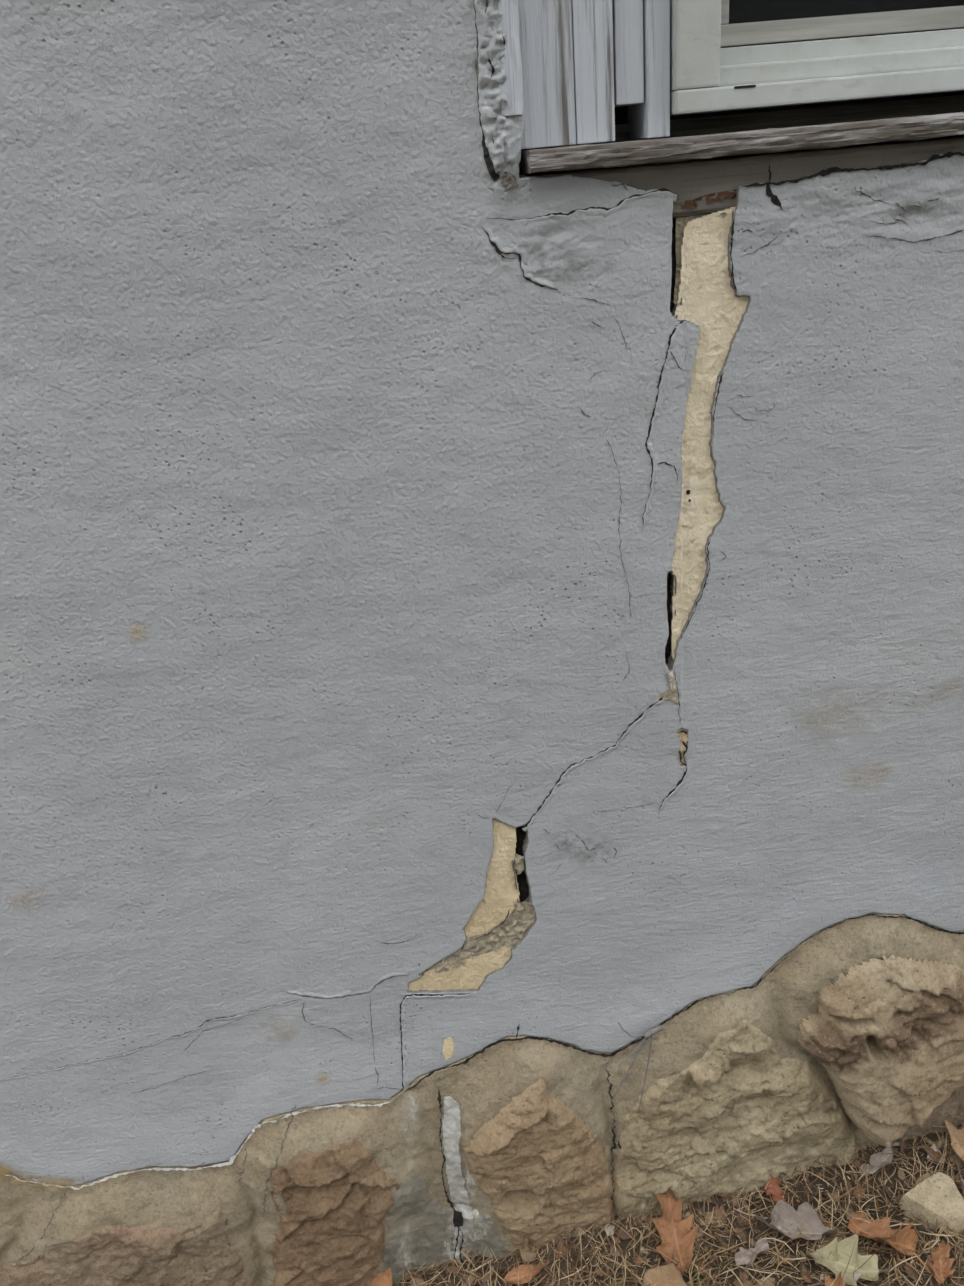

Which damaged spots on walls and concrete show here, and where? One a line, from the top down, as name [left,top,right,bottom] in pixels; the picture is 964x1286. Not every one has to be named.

crack [474,0,677,348]
crack [737,151,964,257]
crack [580,320,691,618]
spalling [654,207,748,708]
crack [730,395,775,421]
crack [664,573,672,664]
crack [479,697,691,902]
spalling [408,819,535,991]